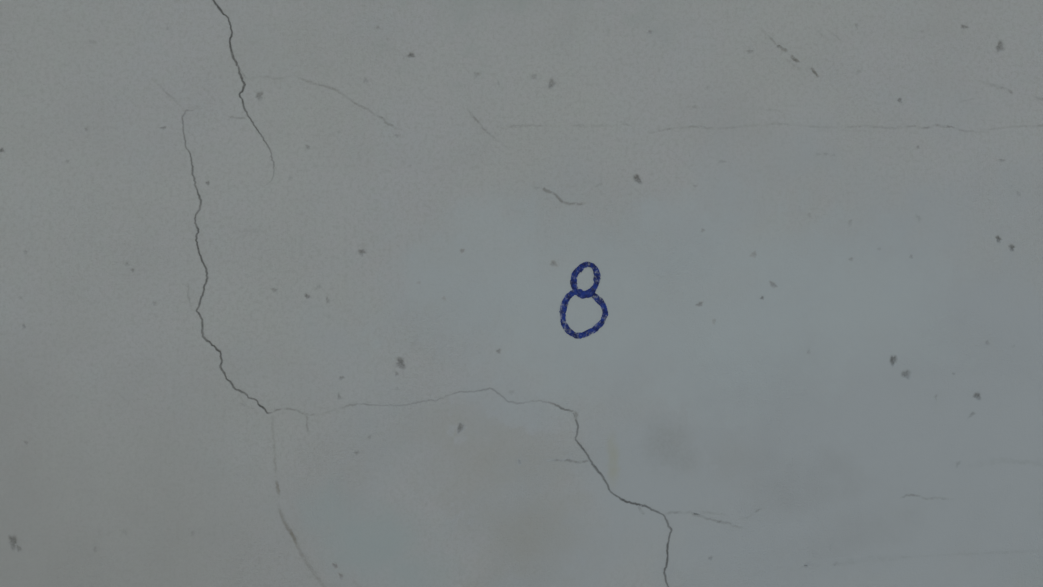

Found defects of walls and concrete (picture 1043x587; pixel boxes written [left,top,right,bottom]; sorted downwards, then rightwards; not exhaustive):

crack [212,0,404,187]
crack [151,77,769,587]